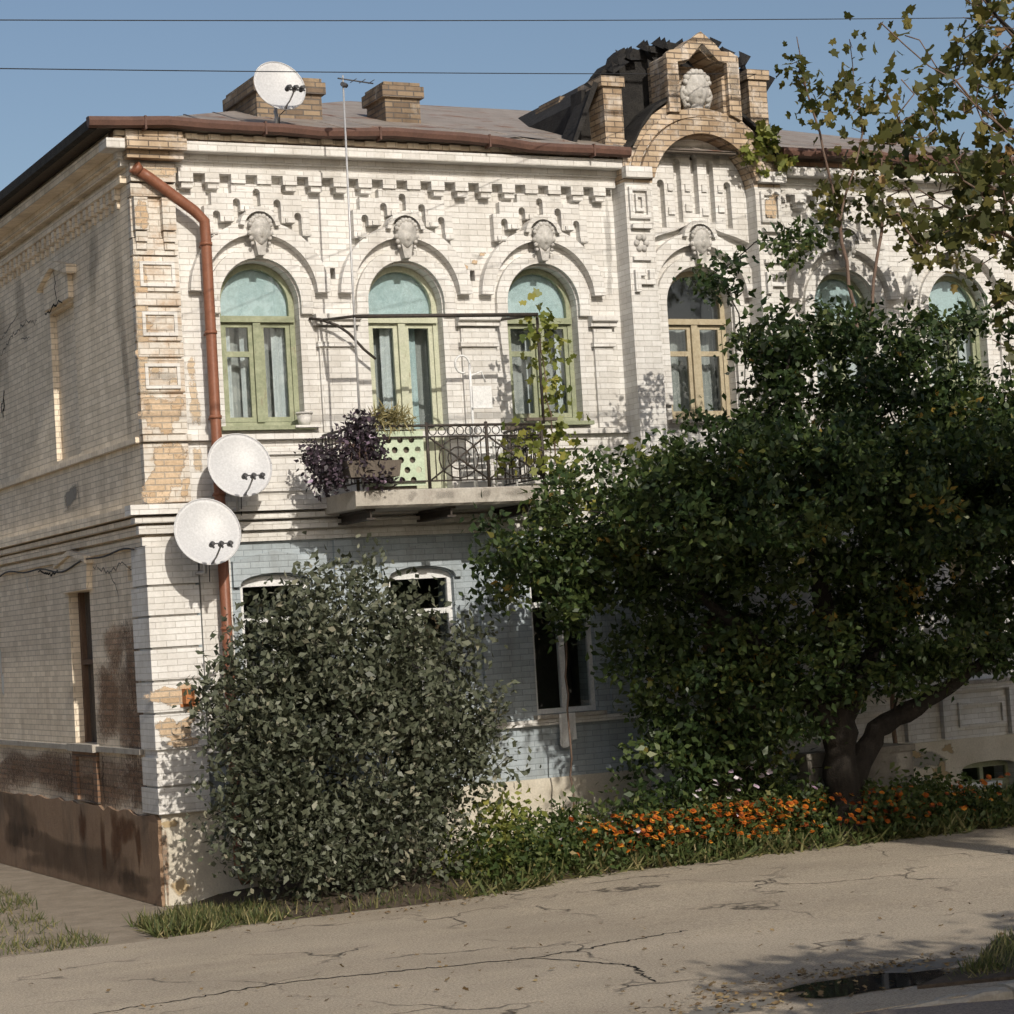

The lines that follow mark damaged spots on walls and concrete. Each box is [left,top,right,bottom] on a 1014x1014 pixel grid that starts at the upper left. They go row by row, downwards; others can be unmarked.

peeling [133,259,148,293]
peeling [135,305,202,504]
peeling [0,627,201,808]
peeling [162,820,189,895]